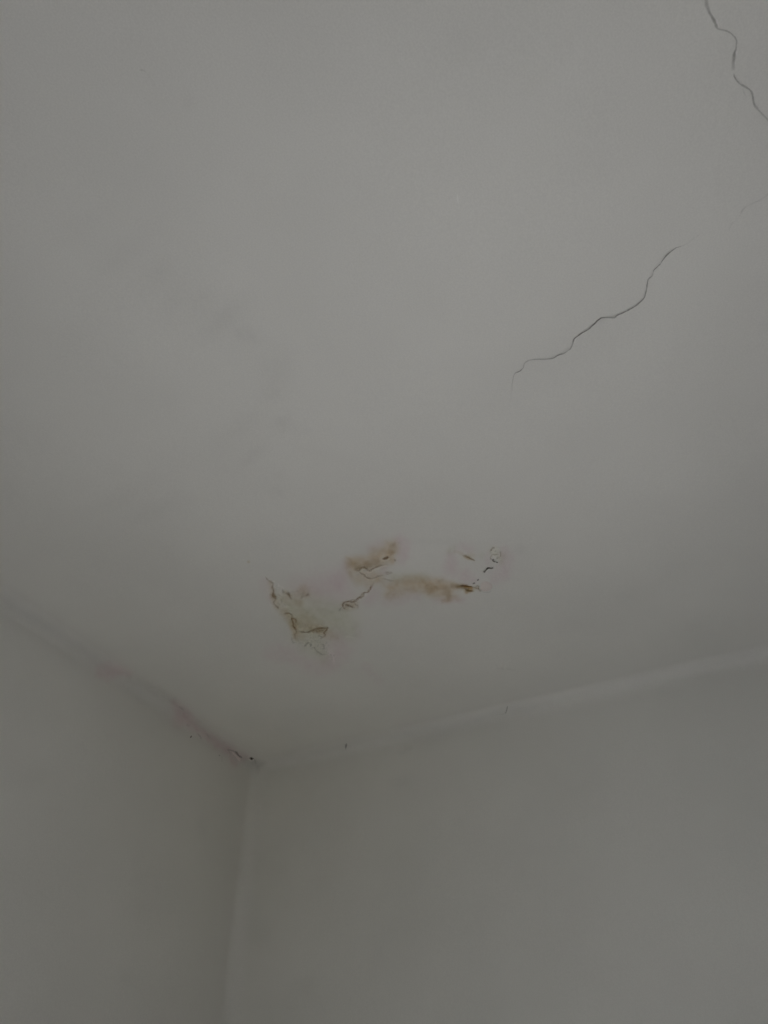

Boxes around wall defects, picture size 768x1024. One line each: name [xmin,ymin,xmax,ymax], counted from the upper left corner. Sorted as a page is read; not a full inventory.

crack [554,302,640,358]